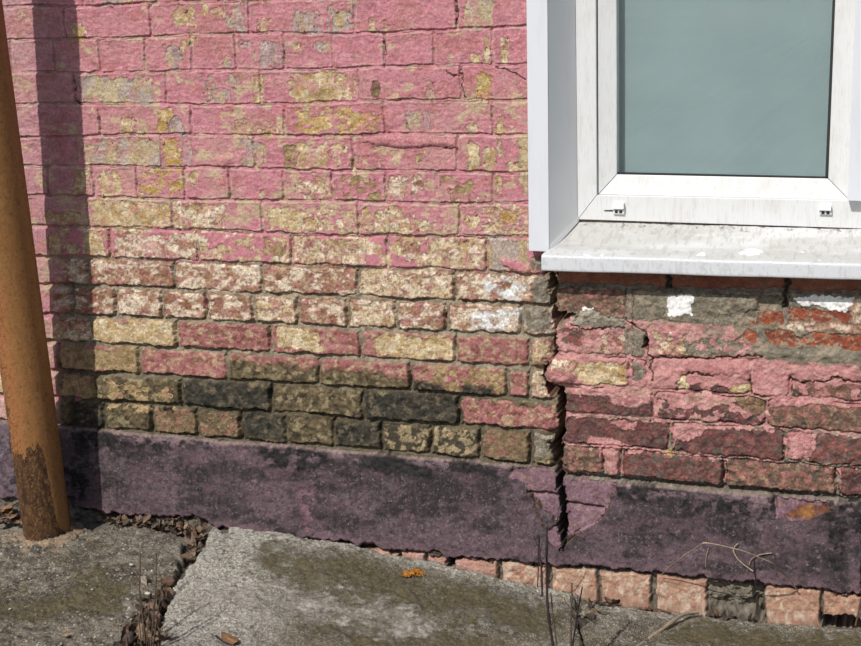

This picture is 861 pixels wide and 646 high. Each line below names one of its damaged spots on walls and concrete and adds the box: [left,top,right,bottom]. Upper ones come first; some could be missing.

peeling [87,0,156,8]
peeling [163,0,354,105]
peeling [462,0,510,105]
peeling [43,69,861,550]
crack [790,376,861,384]
crack [339,252,763,584]
damp [295,487,315,532]
damp [828,528,847,571]
crack [776,567,861,597]